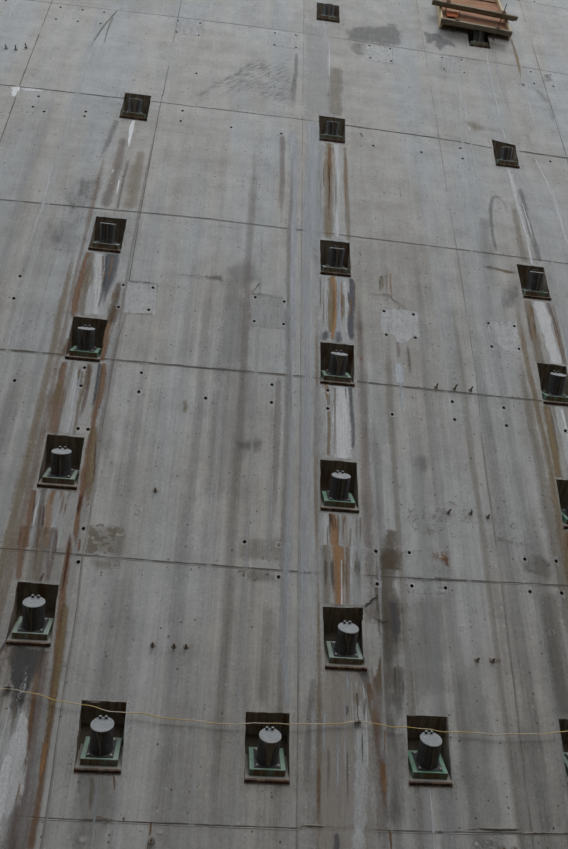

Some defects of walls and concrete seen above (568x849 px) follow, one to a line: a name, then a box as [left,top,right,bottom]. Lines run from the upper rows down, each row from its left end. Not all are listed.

rust [319,138,347,238]
rust [320,271,356,343]
rust [0,247,121,849]
spalling [85,524,127,555]
rust [321,507,363,605]